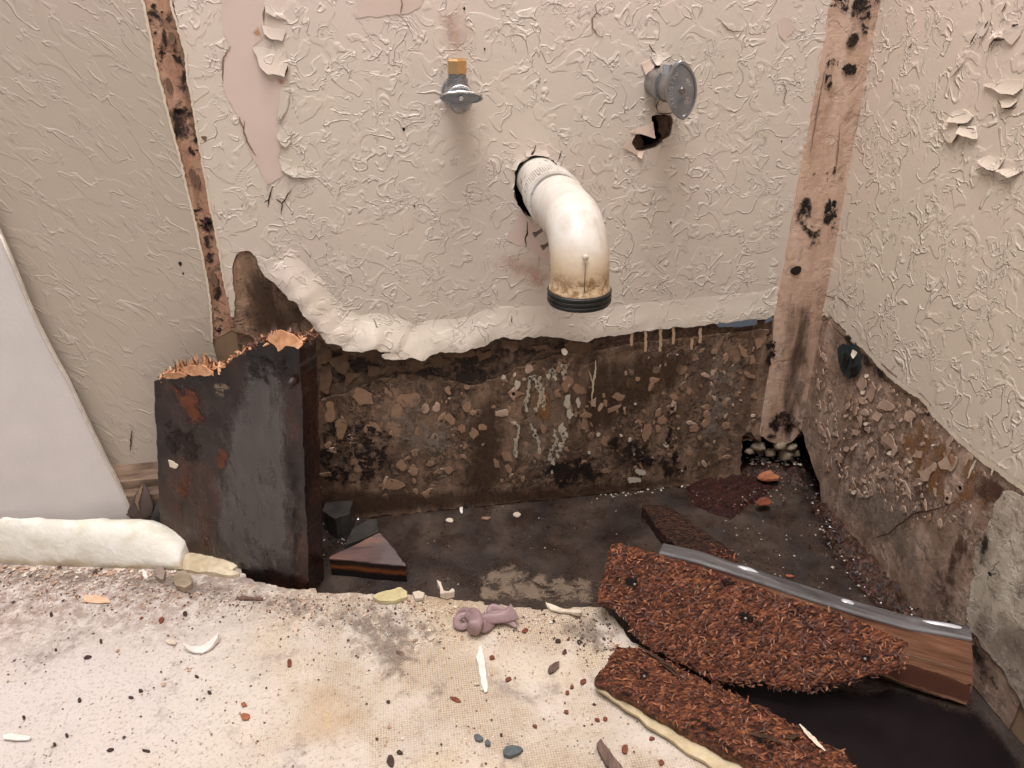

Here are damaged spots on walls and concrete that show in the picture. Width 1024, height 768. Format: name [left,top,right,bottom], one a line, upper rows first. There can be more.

mould [141,0,234,343]
leakage [320,342,688,519]
peeling [221,0,1024,729]
leakage [837,335,885,379]